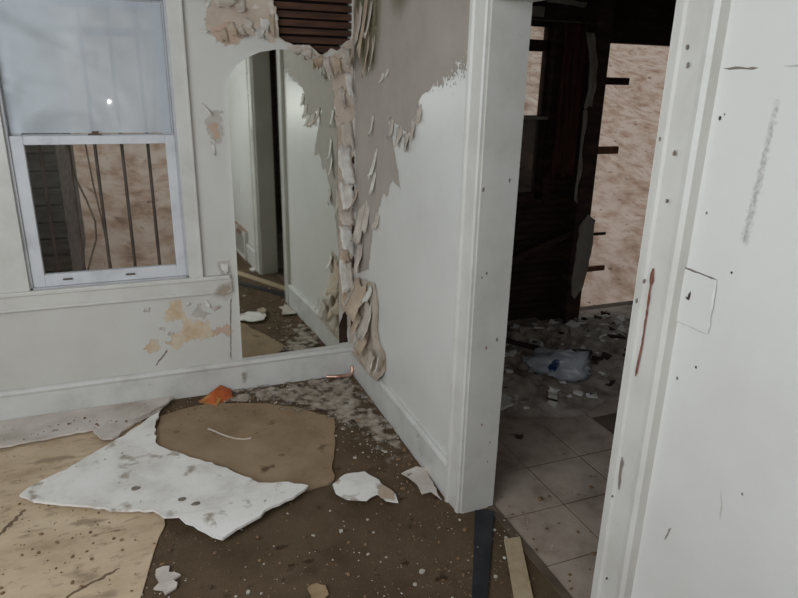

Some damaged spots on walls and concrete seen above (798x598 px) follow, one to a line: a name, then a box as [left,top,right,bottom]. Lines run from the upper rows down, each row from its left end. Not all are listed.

peeling [143,299,233,355]
peeling [199,0,470,345]